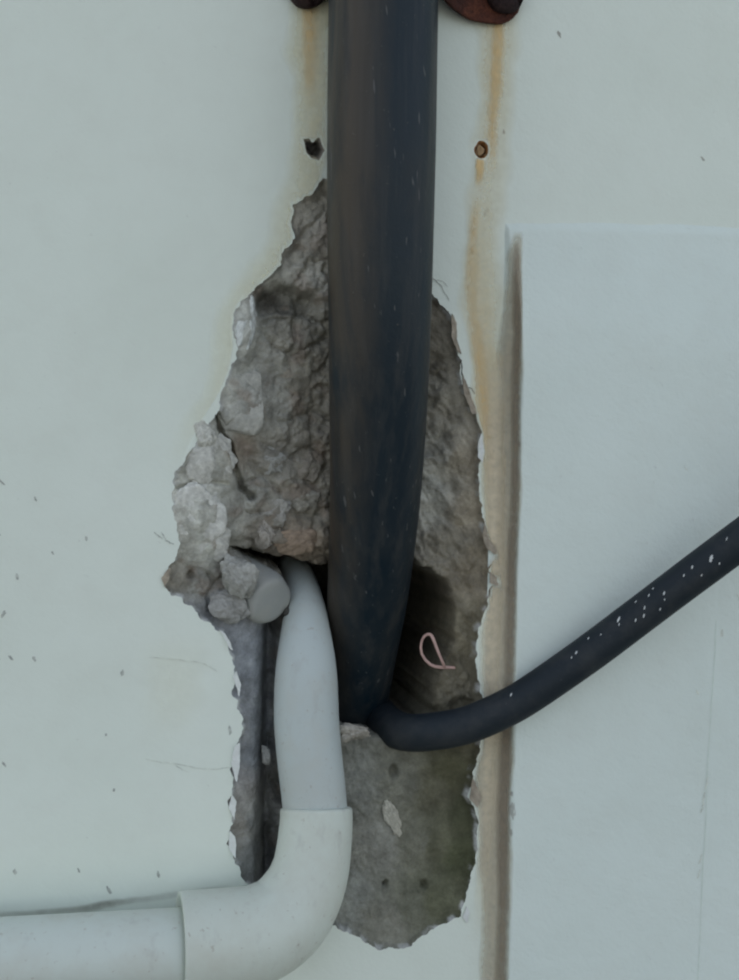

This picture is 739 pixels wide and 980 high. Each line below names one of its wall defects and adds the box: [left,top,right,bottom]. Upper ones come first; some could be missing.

spalling [161,178,330,885]
spalling [389,294,498,714]
spalling [333,720,482,950]